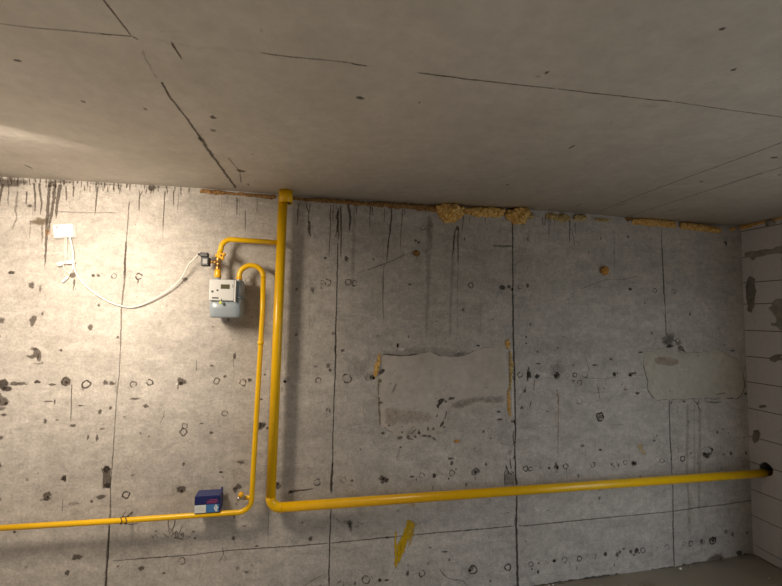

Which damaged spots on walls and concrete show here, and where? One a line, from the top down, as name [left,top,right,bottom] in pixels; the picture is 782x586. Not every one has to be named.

leakage [0,177,190,262]